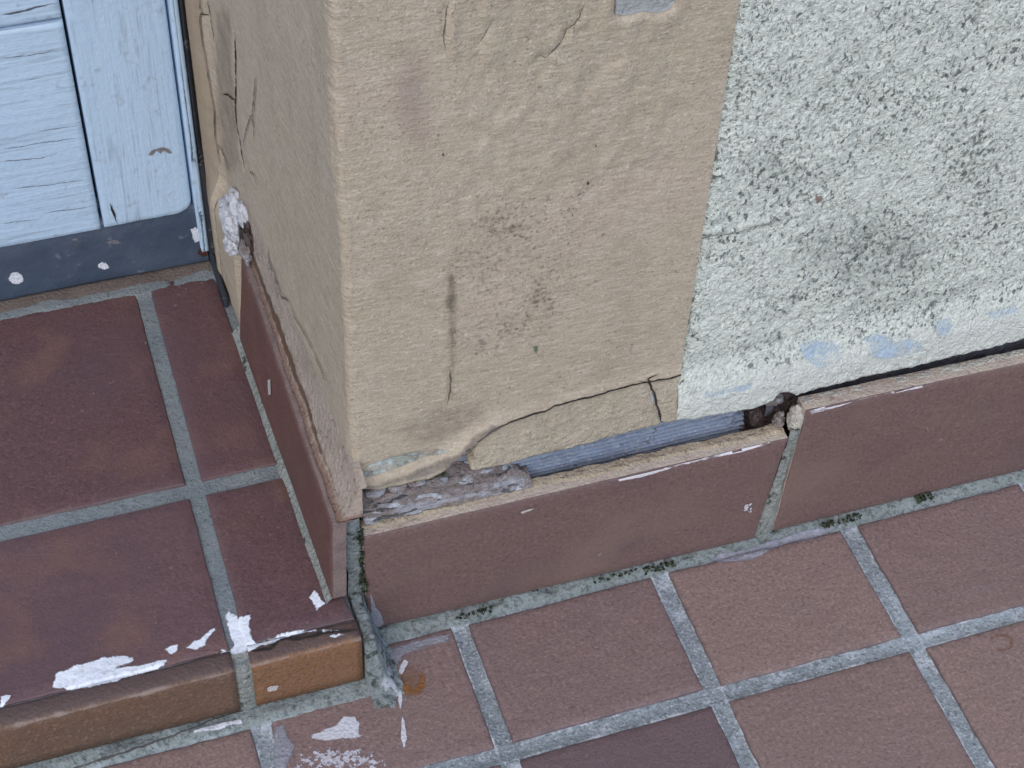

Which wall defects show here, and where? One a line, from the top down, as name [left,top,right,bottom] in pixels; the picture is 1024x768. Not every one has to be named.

crack [443,3,456,45]
crack [538,6,584,58]
crack [199,3,257,186]
crack [453,374,681,464]
spalling [361,335,1024,526]